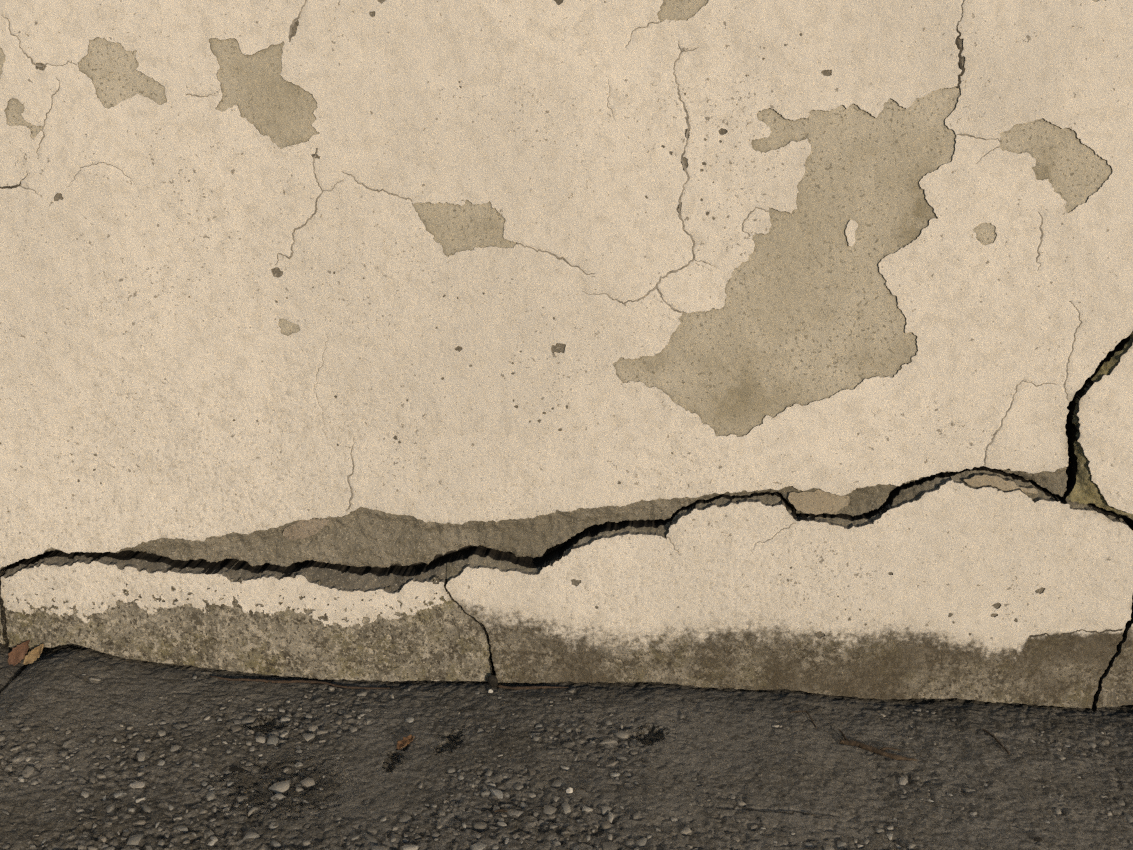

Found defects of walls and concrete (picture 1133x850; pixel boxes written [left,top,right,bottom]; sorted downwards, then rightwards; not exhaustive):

peeling [78,37,167,108]
peeling [209,20,320,159]
peeling [657,0,709,23]
crack [956,0,966,88]
crack [275,148,413,265]
peeling [412,200,517,257]
crack [517,21,716,313]
peeling [613,86,961,436]
peeling [999,118,1112,213]
crack [0,301,1133,676]
damp [463,605,1133,709]
crack [1029,595,1133,712]